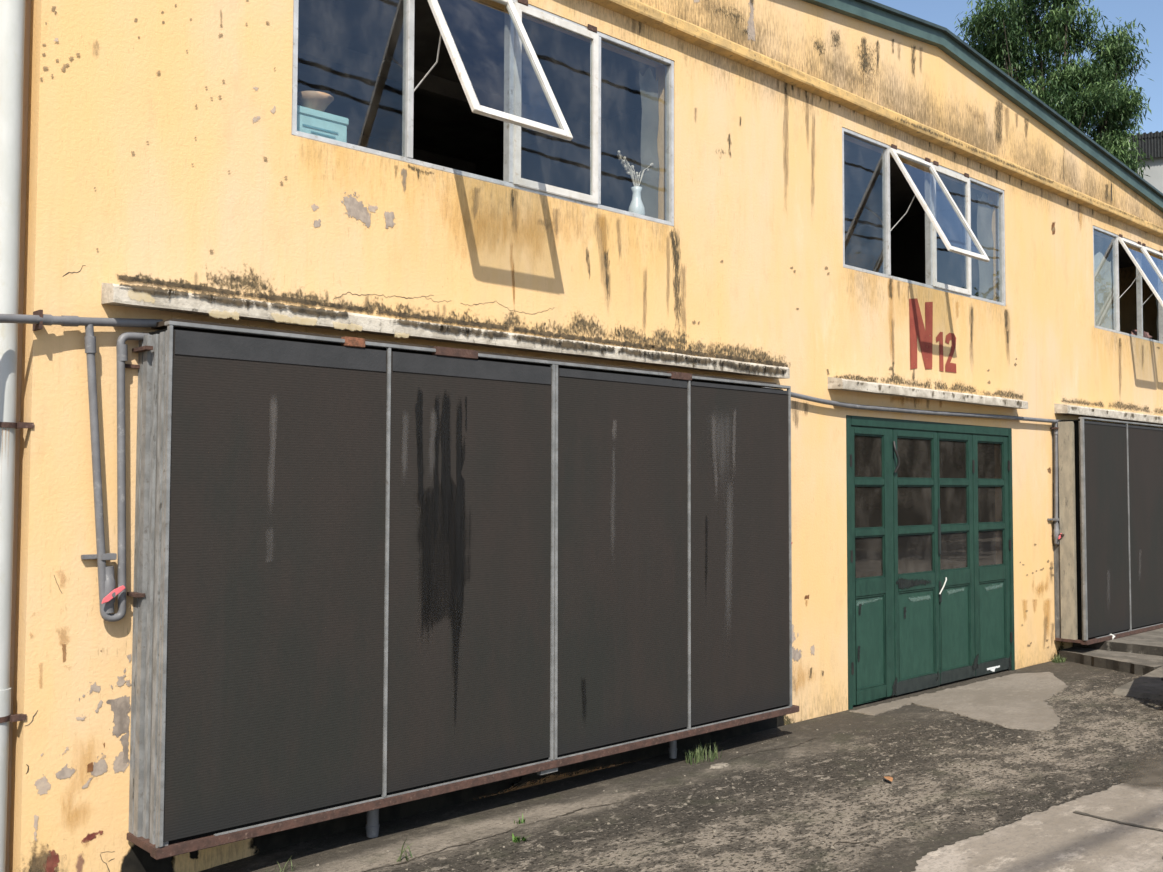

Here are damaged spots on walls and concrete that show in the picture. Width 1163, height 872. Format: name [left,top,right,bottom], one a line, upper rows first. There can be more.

damp [858,38,921,76]
damp [995,101,1028,143]
damp [401,164,434,190]
damp [895,118,1163,229]
flaking render [340,192,395,229]
damp [117,225,791,375]
peeling [34,654,131,795]
damp [24,843,60,872]